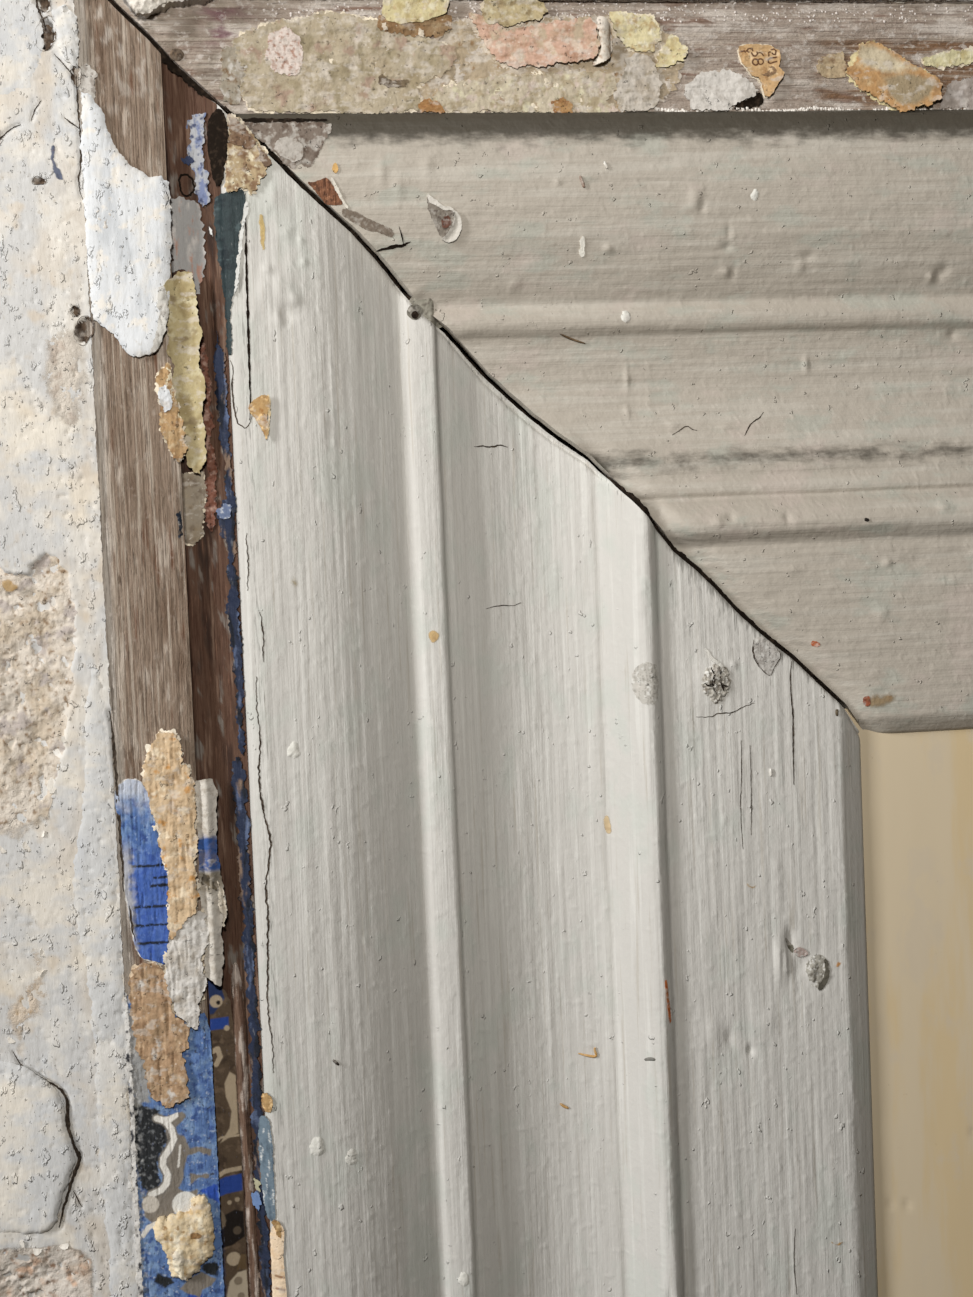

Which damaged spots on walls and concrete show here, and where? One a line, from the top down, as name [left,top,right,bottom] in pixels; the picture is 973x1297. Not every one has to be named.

peeling [613,53,663,113]
peeling [150,286,169,353]